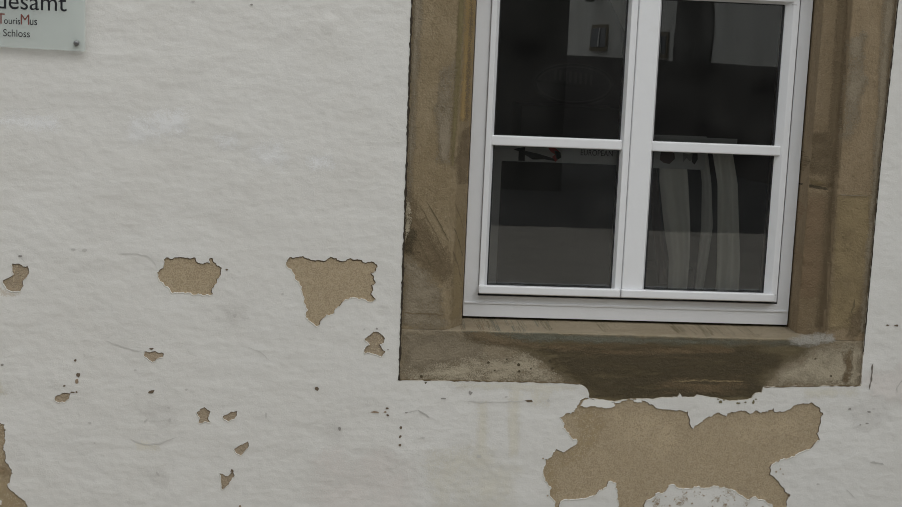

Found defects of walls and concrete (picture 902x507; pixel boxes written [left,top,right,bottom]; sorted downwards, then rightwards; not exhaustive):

flaking render [1,255,29,293]
flaking render [157,257,228,297]
flaking render [285,256,377,328]
water stain [400,0,902,507]
flaking render [143,348,164,363]
flaking render [363,328,389,358]
flaking render [0,423,28,507]
flaking render [542,398,823,507]